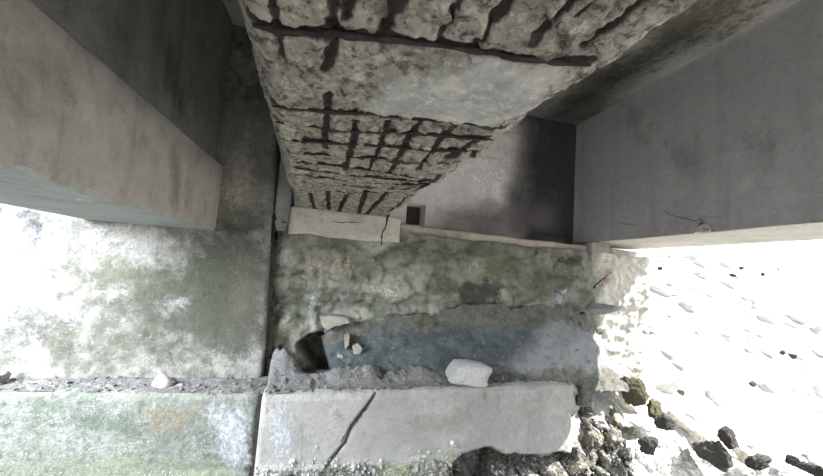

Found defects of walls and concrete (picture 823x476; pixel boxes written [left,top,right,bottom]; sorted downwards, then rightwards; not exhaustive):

spalling [238,0,698,217]
damp [447,0,766,245]
corrosion [222,117,264,210]
damp [11,209,50,241]
efflorescence [367,285,401,298]
damp [459,279,502,305]
crack [322,395,375,476]